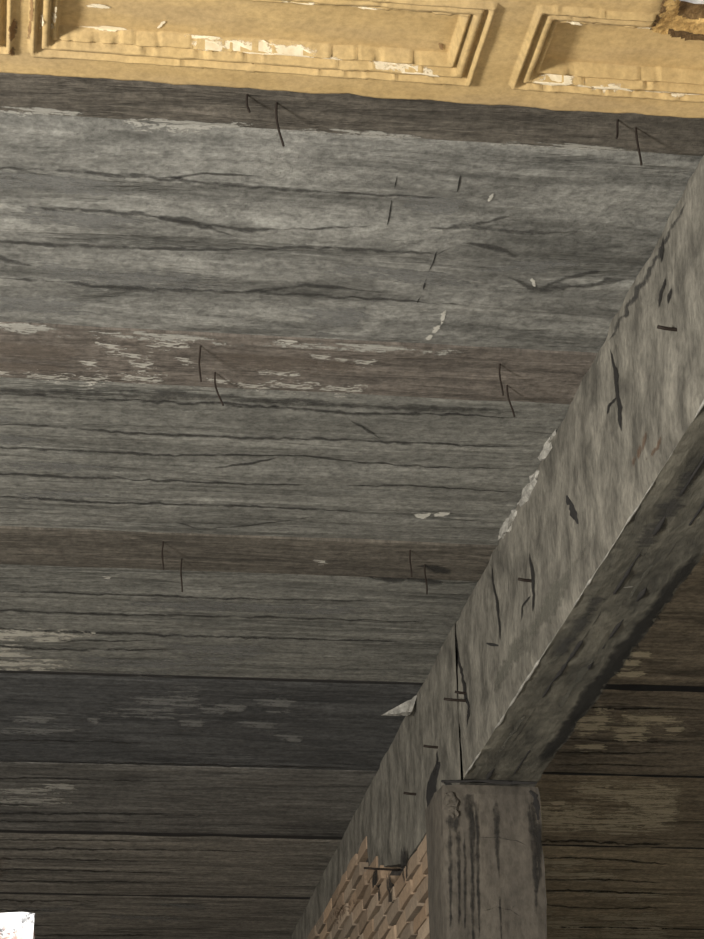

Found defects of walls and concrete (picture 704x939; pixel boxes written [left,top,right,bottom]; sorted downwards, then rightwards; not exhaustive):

spalling [646,0,704,41]
peeling [191,35,317,58]
peeling [374,61,439,77]
peeling [534,74,632,93]
crack [0,208,566,303]